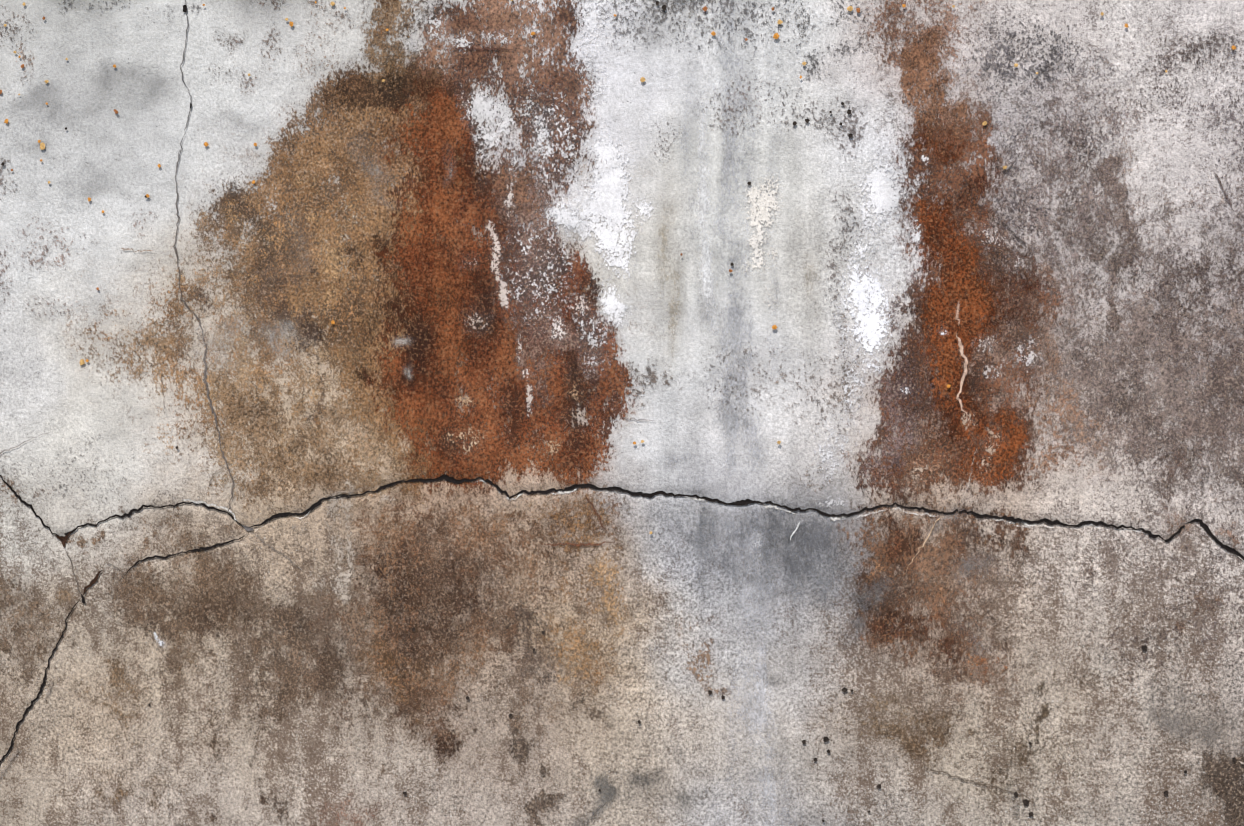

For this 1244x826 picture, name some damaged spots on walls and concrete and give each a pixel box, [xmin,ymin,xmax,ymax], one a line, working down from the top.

crack [180,0,192,99]
rust [70,0,635,764]
crack [0,103,1244,592]
rust [841,0,1122,724]
water stain [961,14,1244,679]
water stain [0,574,86,708]
crack [0,570,102,777]
water stain [66,503,354,821]
water stain [312,479,355,604]
water stain [504,712,564,826]
water stain [575,777,617,826]
water stain [677,611,727,698]